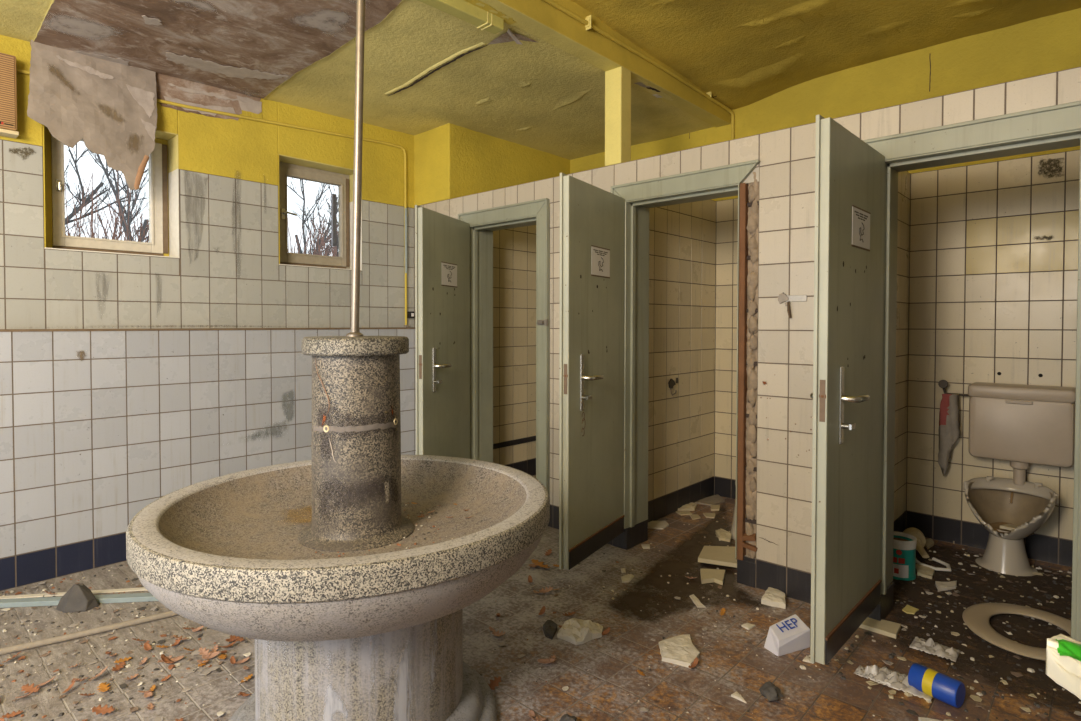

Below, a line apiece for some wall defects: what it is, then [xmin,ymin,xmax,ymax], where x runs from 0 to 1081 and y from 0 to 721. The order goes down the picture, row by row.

peeling [27,0,404,190]
spalling [742,172,759,559]
damp [611,507,768,621]